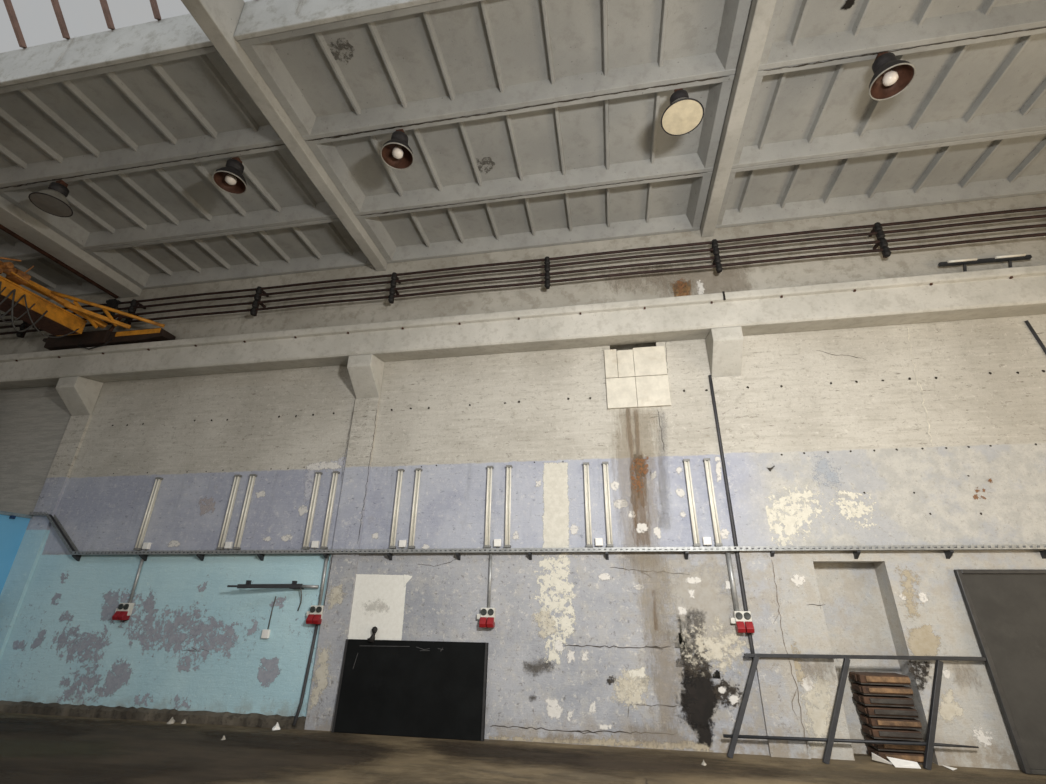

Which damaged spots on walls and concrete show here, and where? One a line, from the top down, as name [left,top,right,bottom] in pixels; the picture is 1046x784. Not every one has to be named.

mould [330,38,353,62]
rust [630,457,649,492]
peeling [765,451,883,553]
peeling [791,574,806,587]
peeling [531,553,589,665]
peeling [13,571,258,707]
peeling [257,657,281,687]
crack [771,560,808,751]
peeling [545,698,574,721]